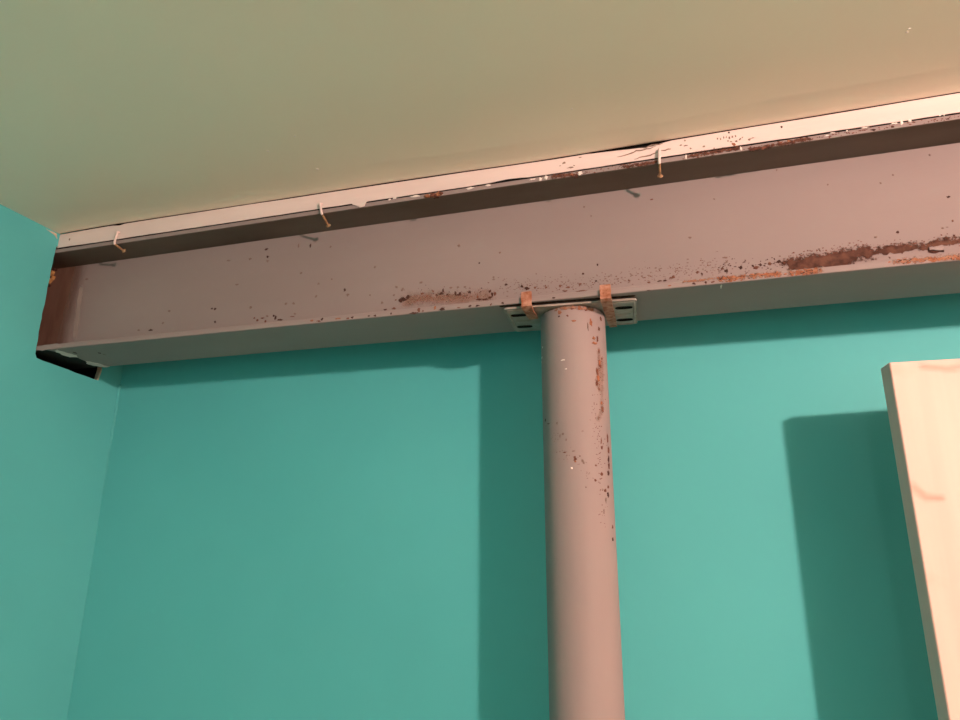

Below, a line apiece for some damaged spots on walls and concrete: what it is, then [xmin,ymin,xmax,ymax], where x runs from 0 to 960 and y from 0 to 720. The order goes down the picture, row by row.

crack [590,139,672,159]
corrosion [368,220,960,541]